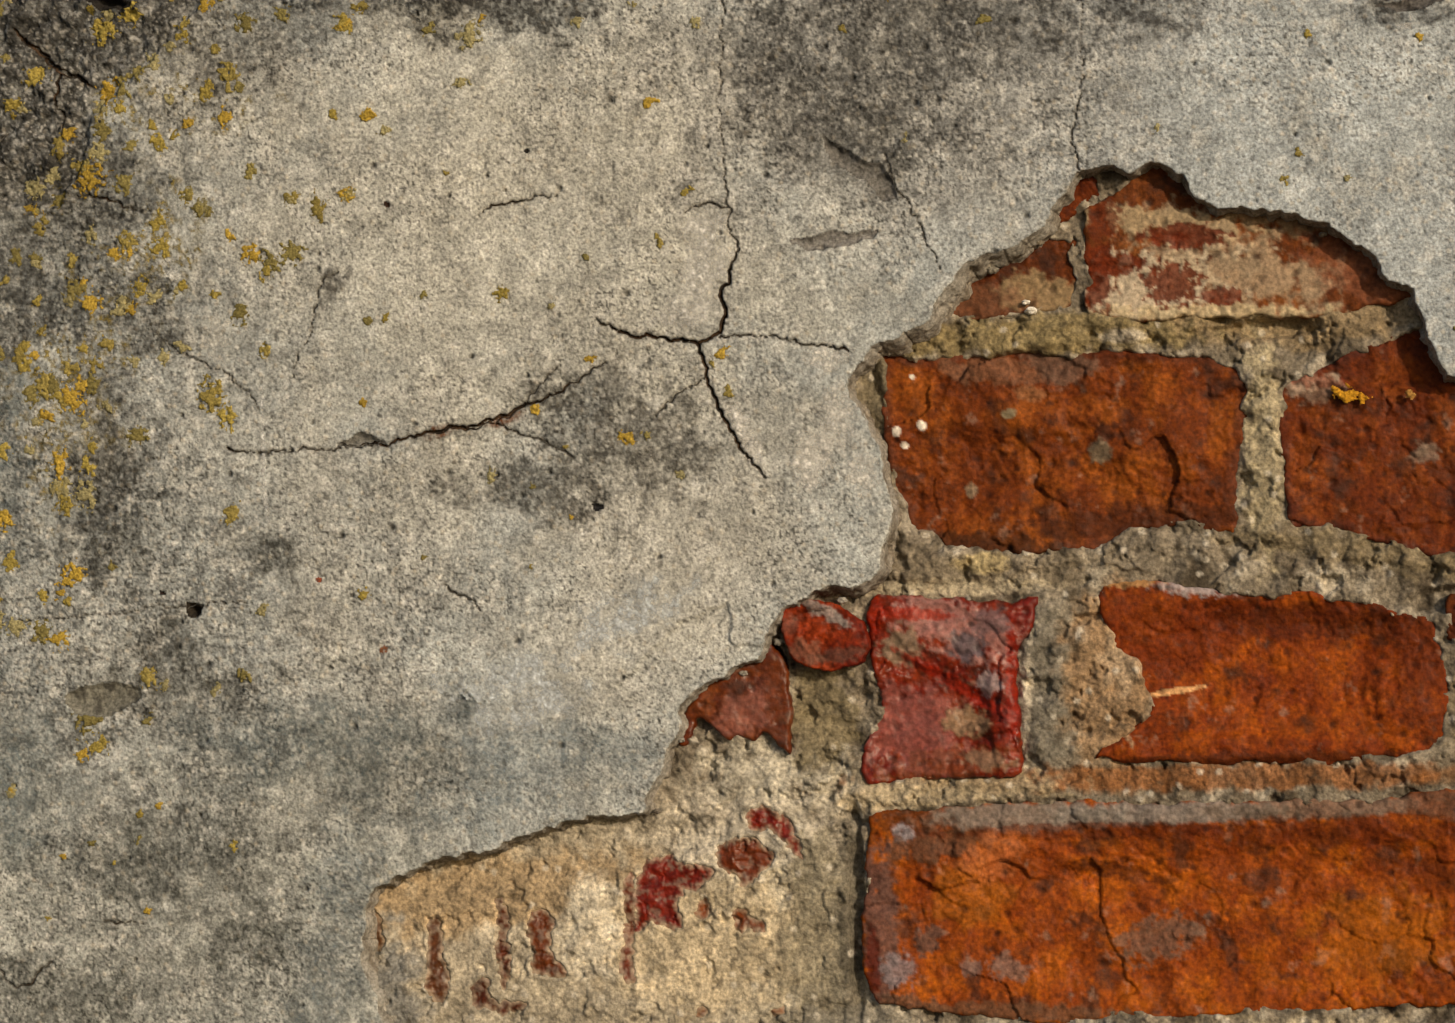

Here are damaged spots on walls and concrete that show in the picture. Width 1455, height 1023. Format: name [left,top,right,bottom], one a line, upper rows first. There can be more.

crack [13,28,92,139]
crack [227,0,849,478]
crack [886,156,941,270]
peeling [337,432,386,448]
flaking render [360,161,1455,1023]